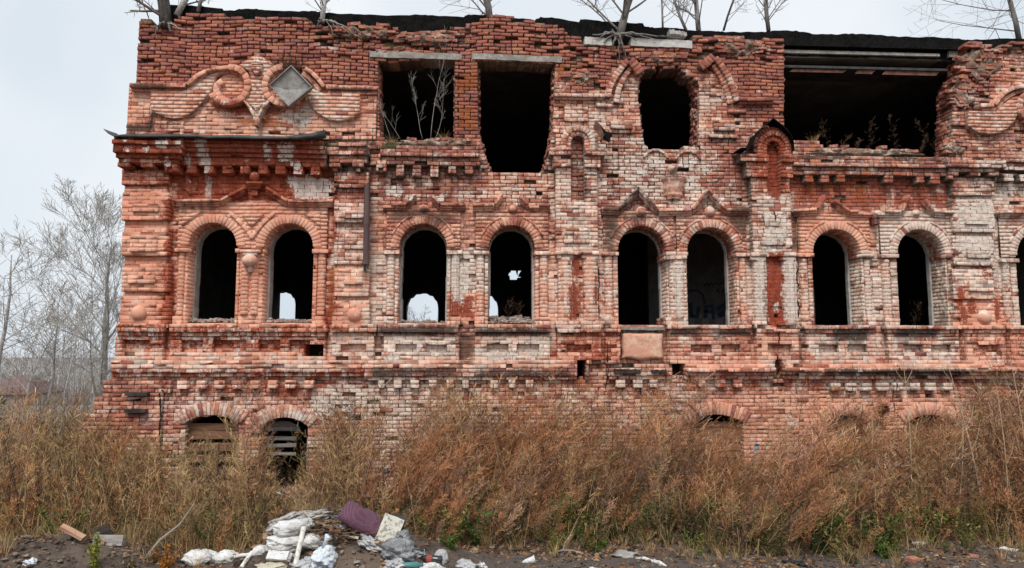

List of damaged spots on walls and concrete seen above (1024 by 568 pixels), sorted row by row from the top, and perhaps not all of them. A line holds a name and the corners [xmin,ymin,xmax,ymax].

damp [172,138,334,213]
peeling [446,250,475,319]
peeling [567,251,600,321]
peeling [755,211,798,323]